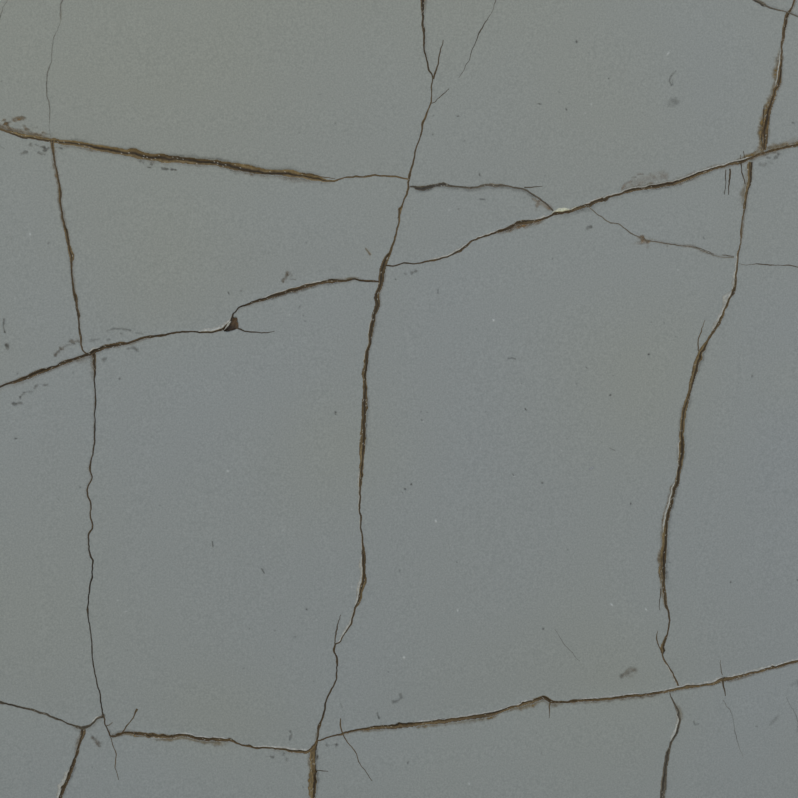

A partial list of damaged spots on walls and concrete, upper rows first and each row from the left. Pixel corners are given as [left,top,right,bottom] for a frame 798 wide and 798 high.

crack [45,53,53,124]
crack [0,128,408,418]
crack [316,0,798,773]
crack [0,419,323,798]
crack [660,693,681,798]